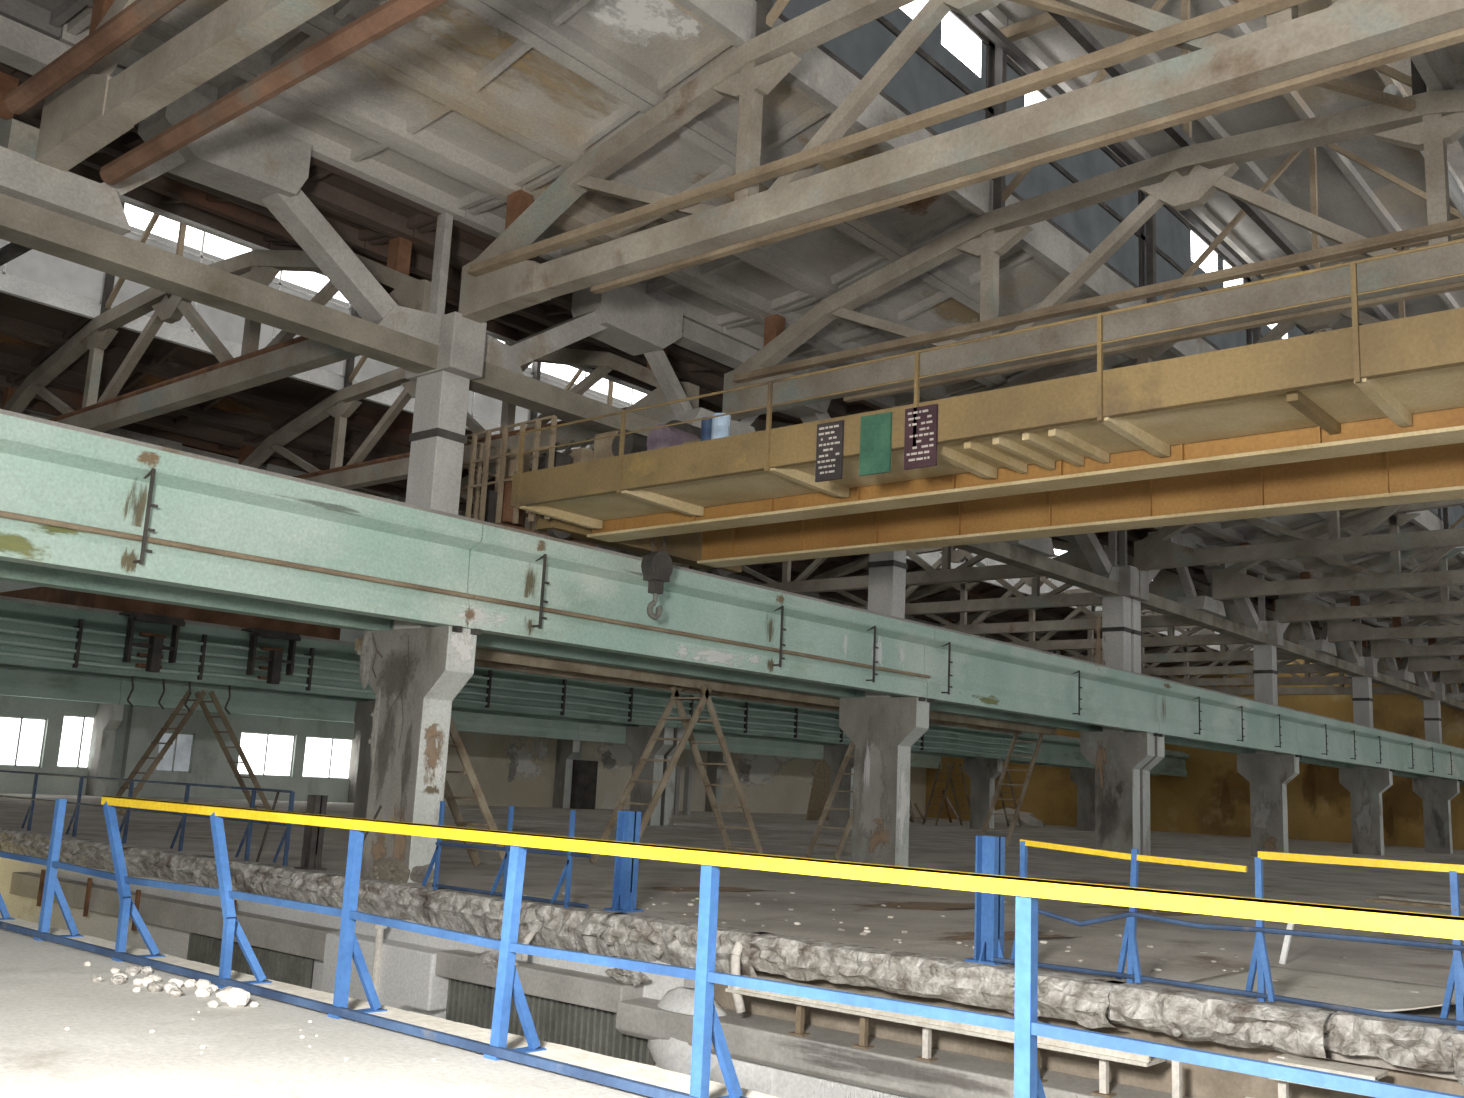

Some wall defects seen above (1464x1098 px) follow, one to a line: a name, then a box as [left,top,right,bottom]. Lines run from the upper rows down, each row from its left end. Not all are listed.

corrosion [125,452,159,527]
corrosion [121,549,137,571]
peeling [678,644,761,665]